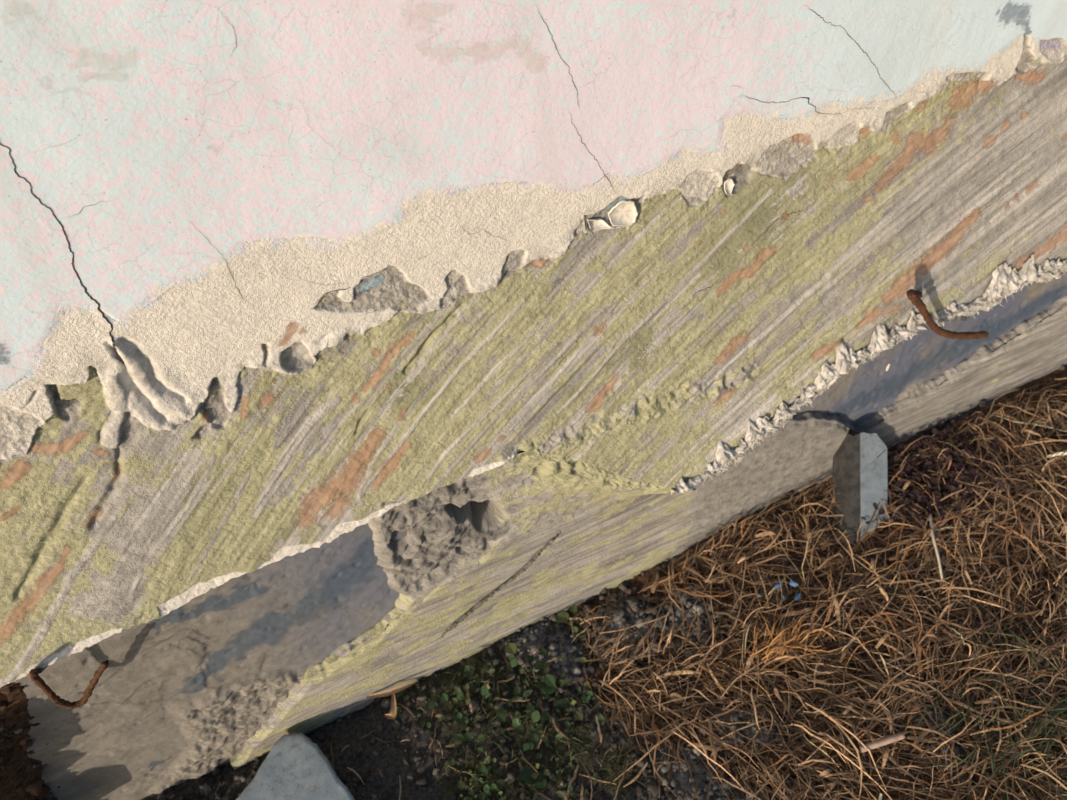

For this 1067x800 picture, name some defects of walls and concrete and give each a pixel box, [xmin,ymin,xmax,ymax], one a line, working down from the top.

crack [538,11,616,193]
crack [730,5,928,115]
flaking render [0,384,83,460]
crack [0,143,125,386]
flaking render [192,377,229,440]
flaking render [262,340,316,374]
flaking render [312,265,473,313]
flaking render [583,195,646,233]
damp [671,255,1067,495]
corrosion [855,209,982,328]
spalling [906,289,989,340]
spalling [156,447,520,617]